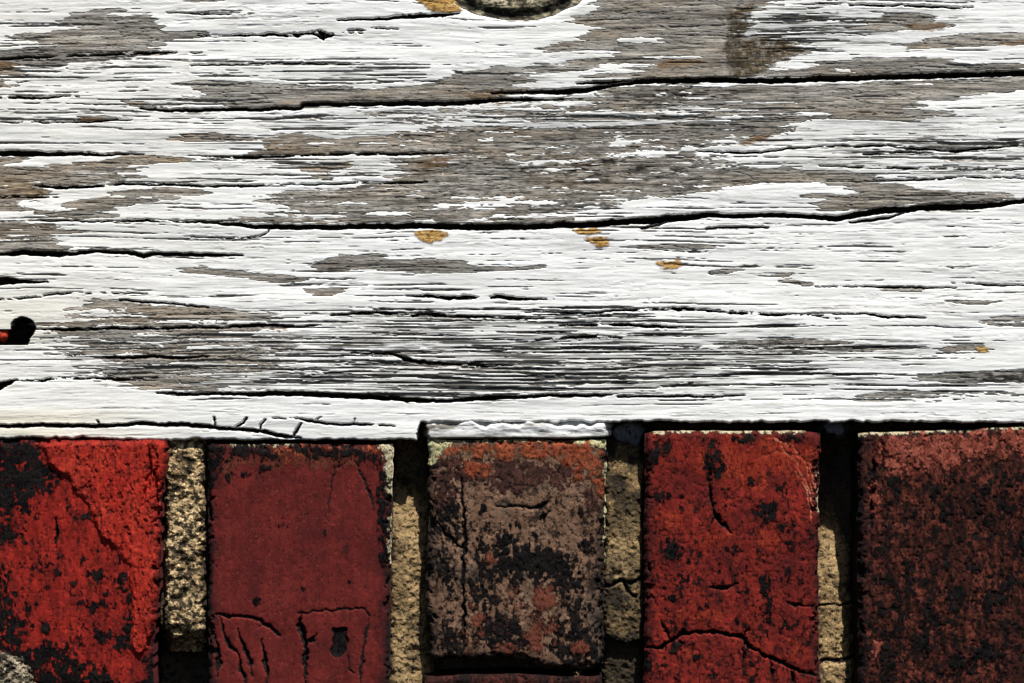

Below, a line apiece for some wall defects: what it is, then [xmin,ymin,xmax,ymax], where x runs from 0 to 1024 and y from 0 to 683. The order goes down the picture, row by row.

peeling [0,9,209,88]
crack [0,71,1024,124]
peeling [167,0,1024,225]
peeling [0,156,213,252]
peeling [178,254,546,296]
crack [0,145,1024,438]
peeling [28,298,318,393]
peeling [848,369,1024,402]
crack [52,517,60,548]
crack [707,469,729,532]
crack [214,607,370,683]
crack [645,621,853,683]